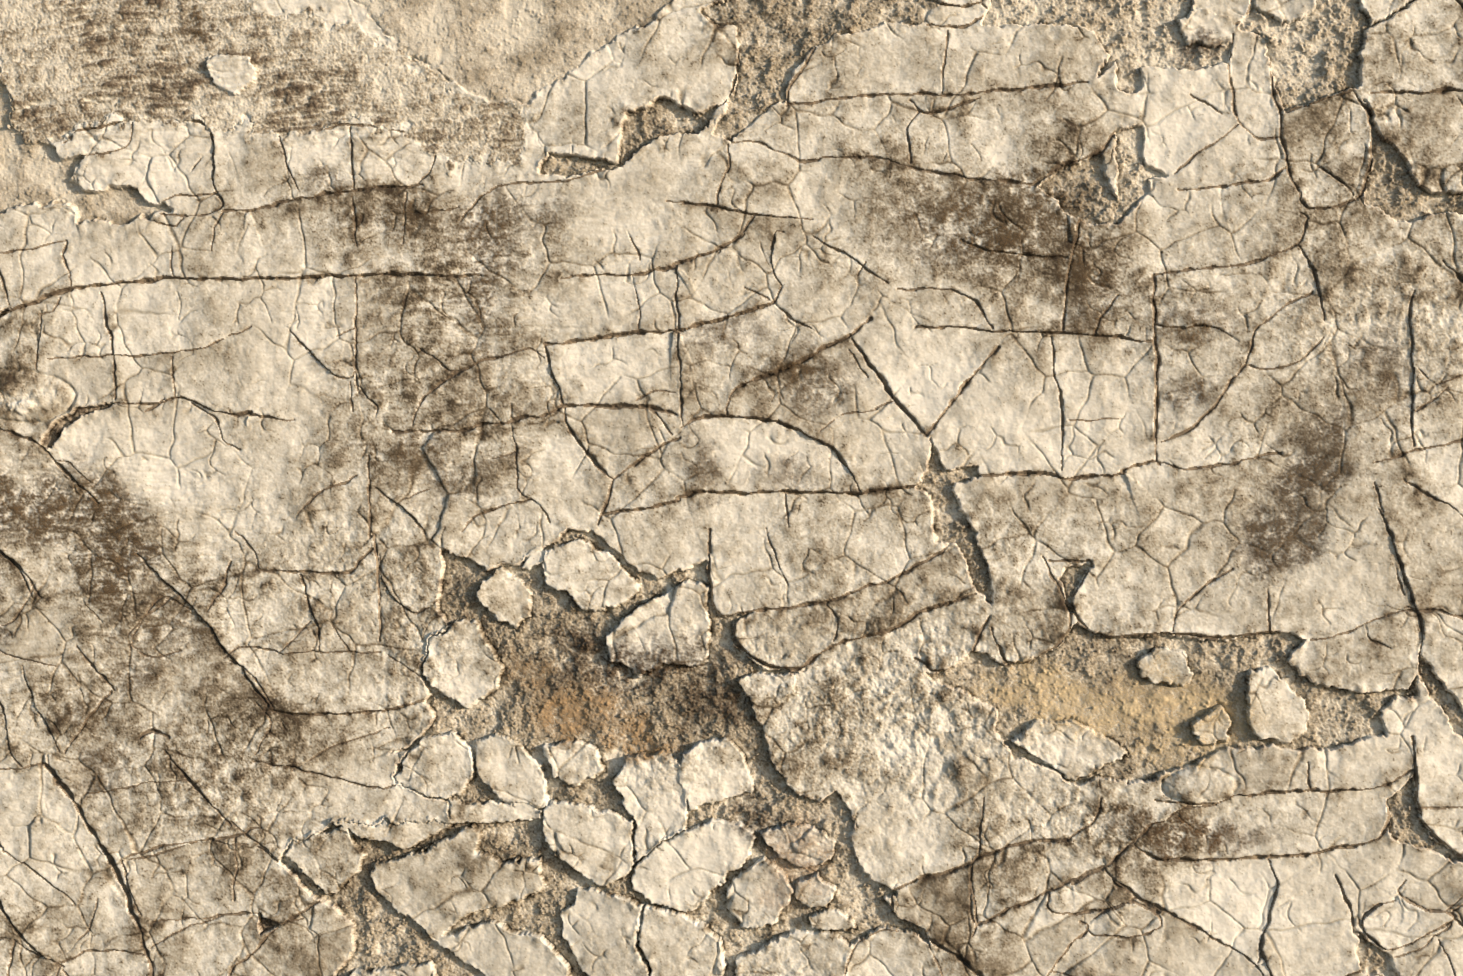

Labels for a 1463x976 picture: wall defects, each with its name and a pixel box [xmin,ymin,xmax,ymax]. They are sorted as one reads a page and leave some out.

peeling [0,0,942,227]
crack [0,0,1463,672]
crack [0,550,320,976]
crack [84,455,438,790]
spalling [257,913,280,936]
spalling [277,526,932,976]
crack [844,735,1463,976]
spalling [922,562,1463,787]